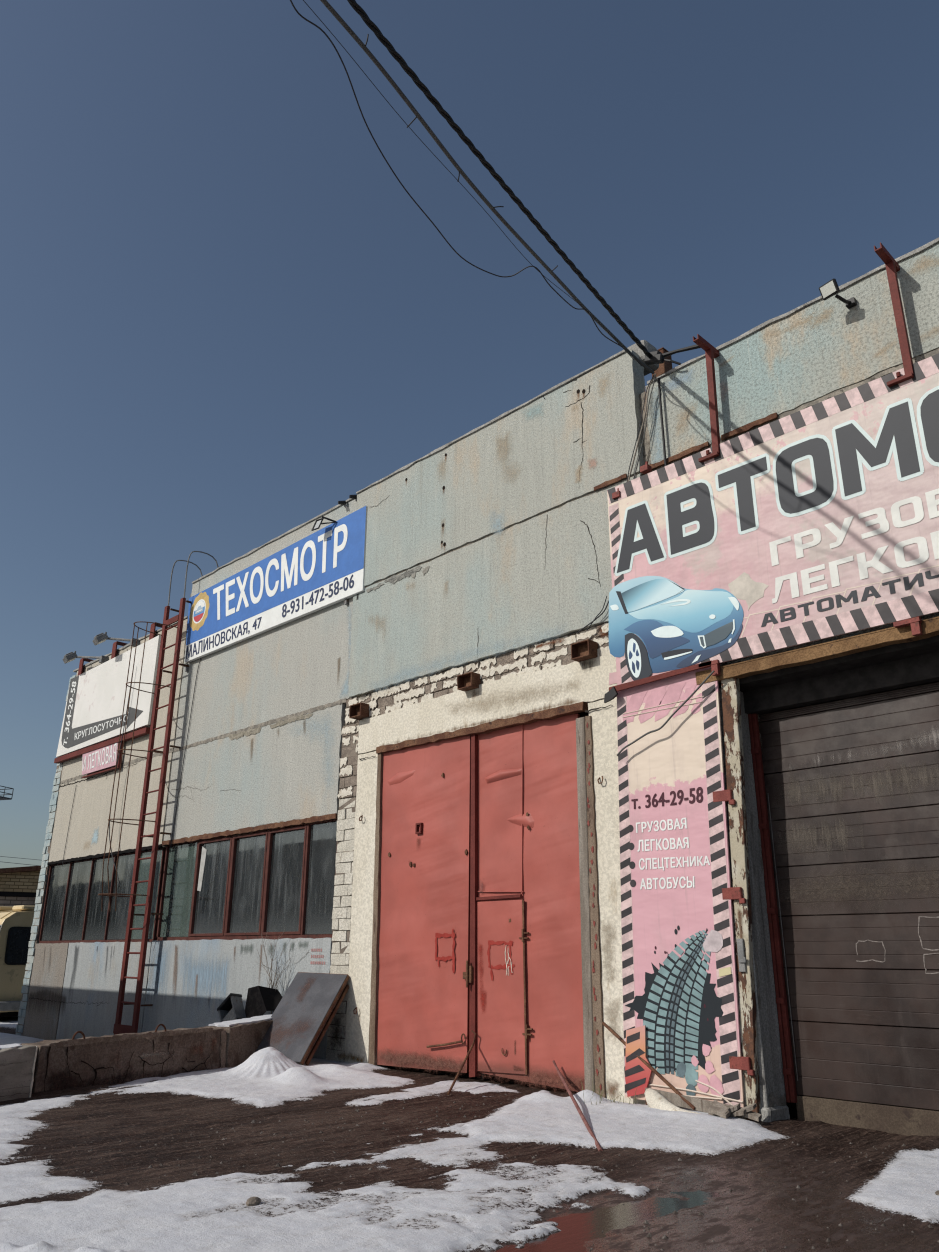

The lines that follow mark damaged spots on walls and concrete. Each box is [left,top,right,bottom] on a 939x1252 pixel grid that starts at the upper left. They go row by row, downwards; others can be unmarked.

peeling [337,623,610,798]
spalling [768,1092,786,1108]